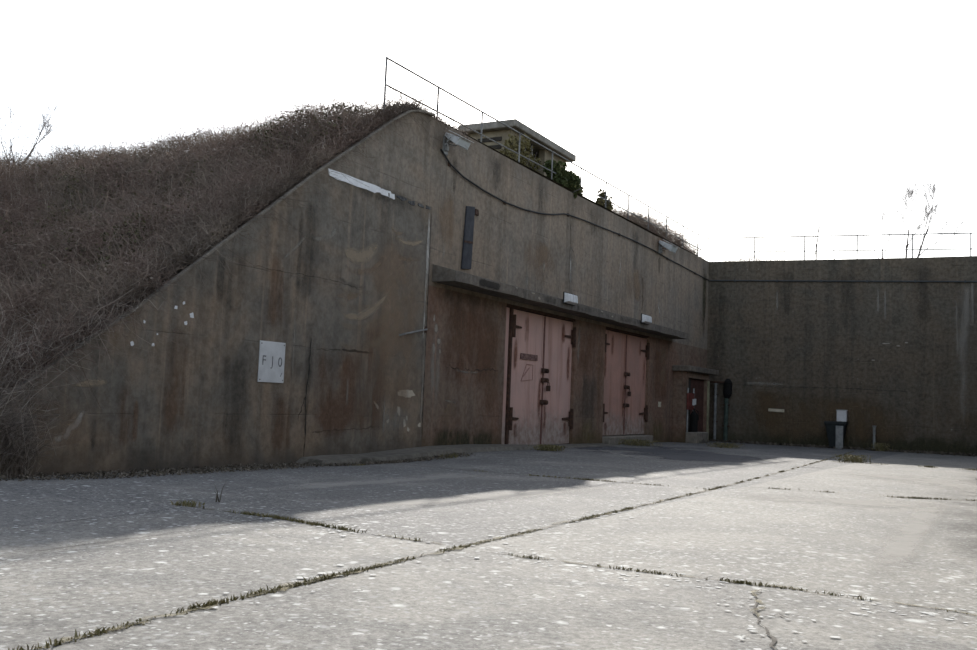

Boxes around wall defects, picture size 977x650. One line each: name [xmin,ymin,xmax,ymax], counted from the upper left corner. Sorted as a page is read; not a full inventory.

crack [7,451,977,650]